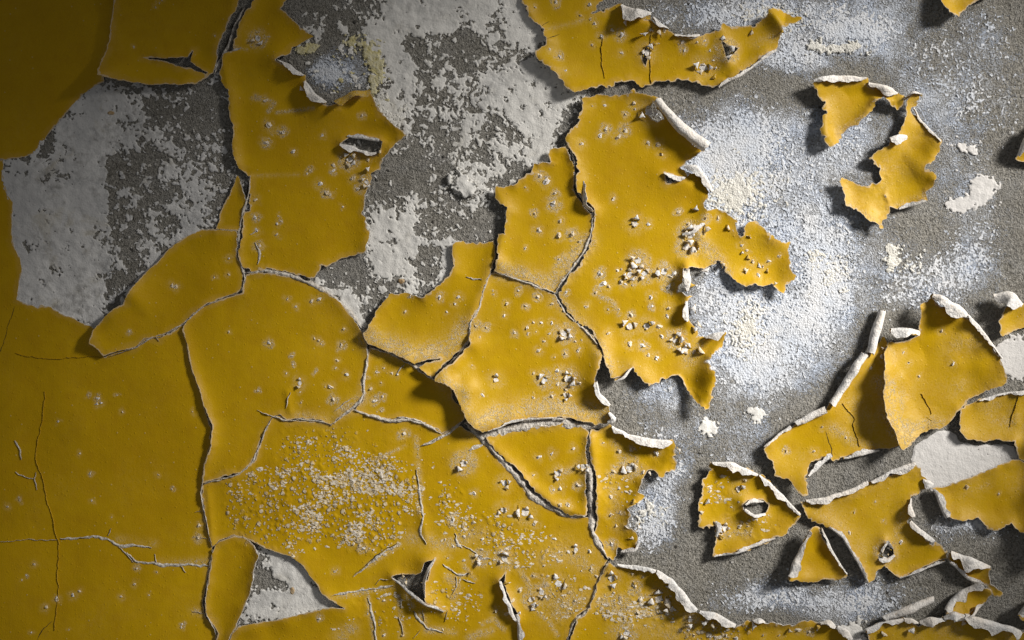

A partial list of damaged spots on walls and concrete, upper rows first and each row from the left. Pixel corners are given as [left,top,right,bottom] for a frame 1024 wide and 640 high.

crack [0,149,609,640]
peeling [0,0,802,640]
peeling [698,291,1024,640]
peeling [813,75,942,229]
peeling [941,0,978,17]
peeling [1015,138,1024,162]